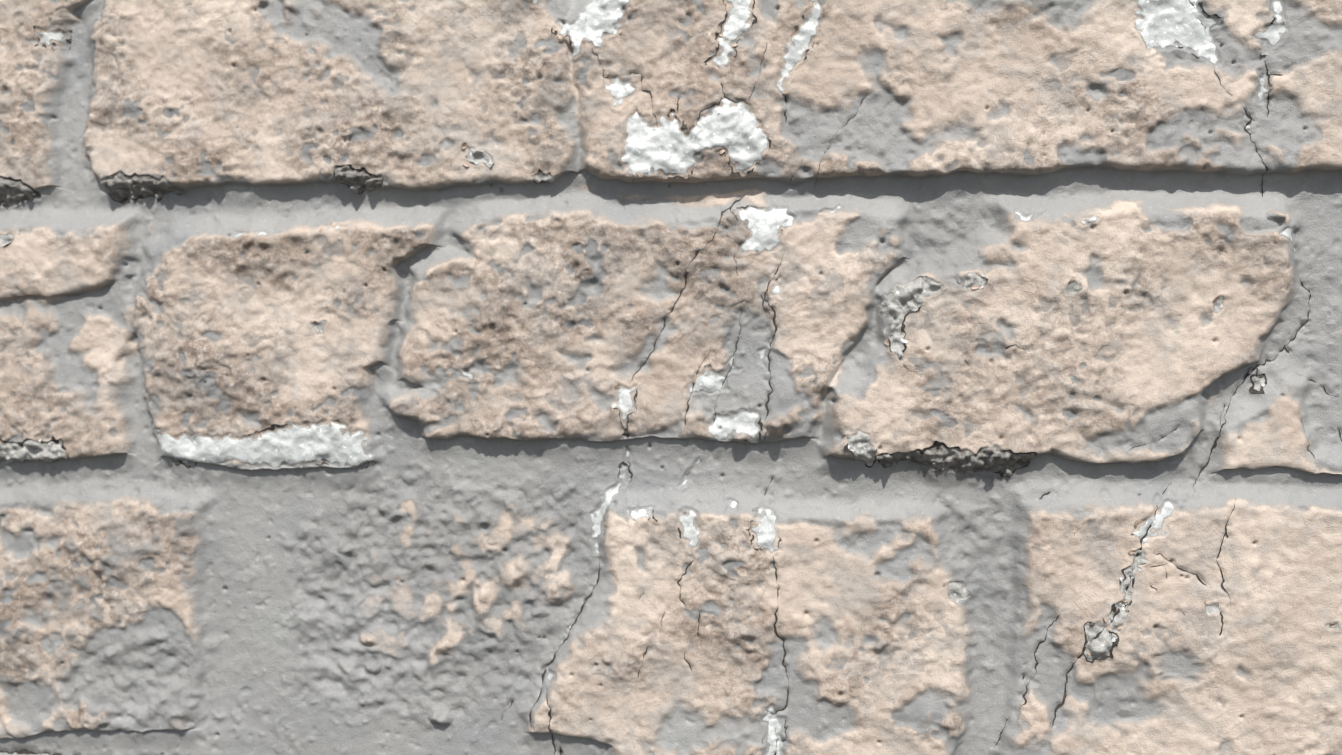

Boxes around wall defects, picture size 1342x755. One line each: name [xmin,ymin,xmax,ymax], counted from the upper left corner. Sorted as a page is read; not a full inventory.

peeling [551,0,629,57]
peeling [704,0,757,69]
peeling [776,0,824,94]
peeling [1135,0,1224,68]
peeling [603,74,771,181]
peeling [730,205,793,253]
crack [631,193,785,442]
peeling [147,409,372,469]
spalling [841,430,1037,478]
crack [994,263,1342,747]
crack [501,559,600,755]
crack [767,558,789,755]